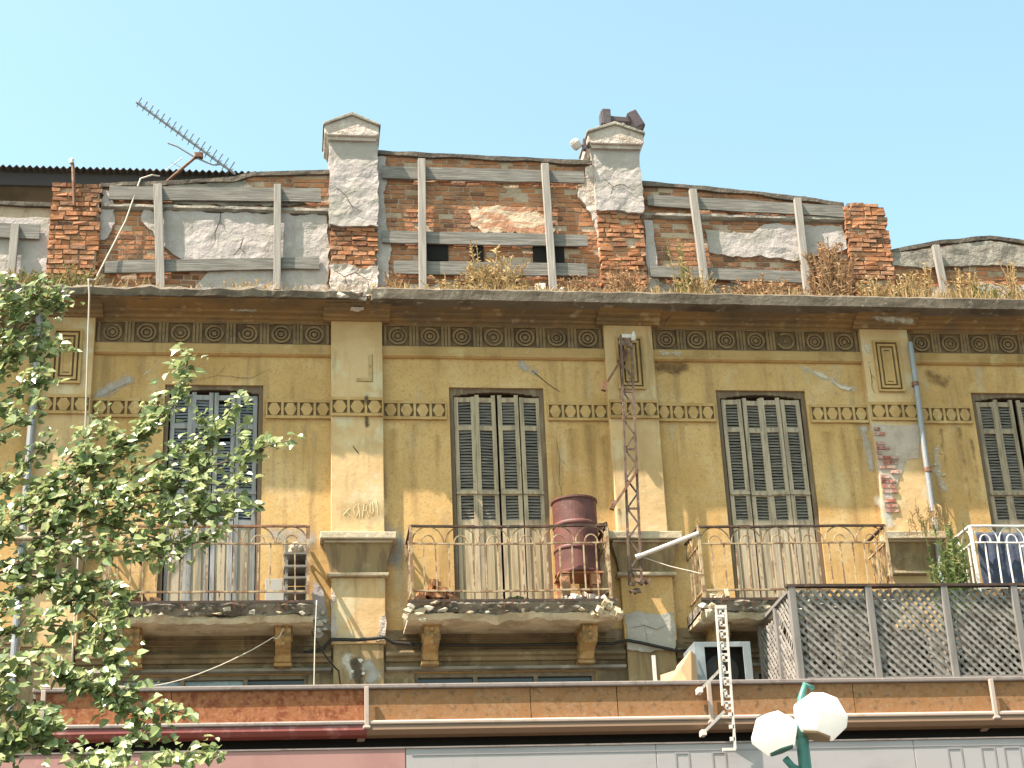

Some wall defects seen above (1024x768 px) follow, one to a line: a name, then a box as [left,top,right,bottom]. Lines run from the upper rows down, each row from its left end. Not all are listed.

spalling [809,369,854,391]
spalling [861,424,920,527]
flaking render [624,611,676,653]